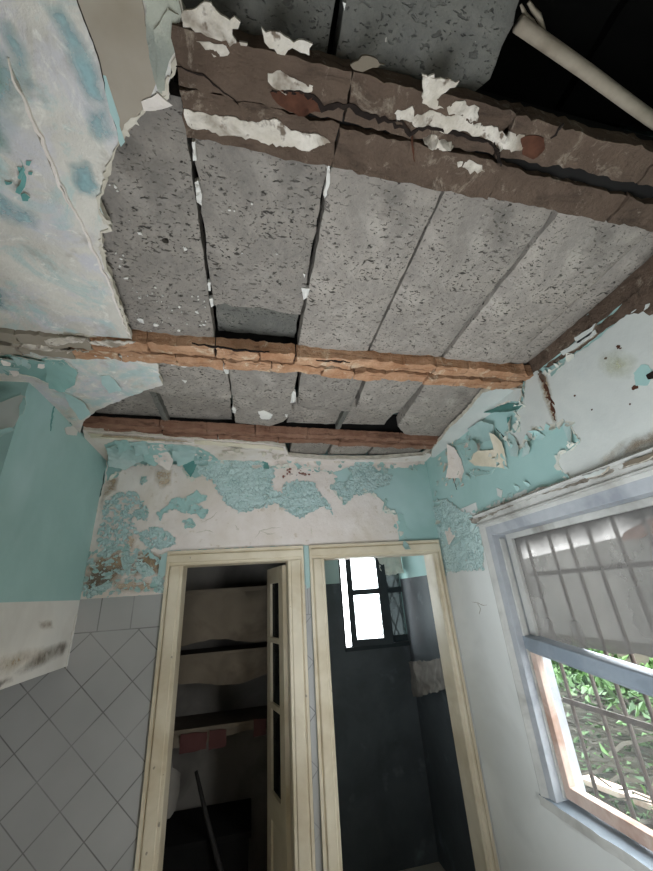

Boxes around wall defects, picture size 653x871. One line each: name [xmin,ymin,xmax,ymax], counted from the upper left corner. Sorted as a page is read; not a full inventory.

crack [176,66,238,104]
crack [270,90,502,166]
peeling [395,73,525,152]
crack [521,123,564,160]
peeling [457,160,485,174]
peeling [0,0,426,599]
crack [192,342,270,353]
crack [316,357,350,365]
peeling [434,255,653,524]